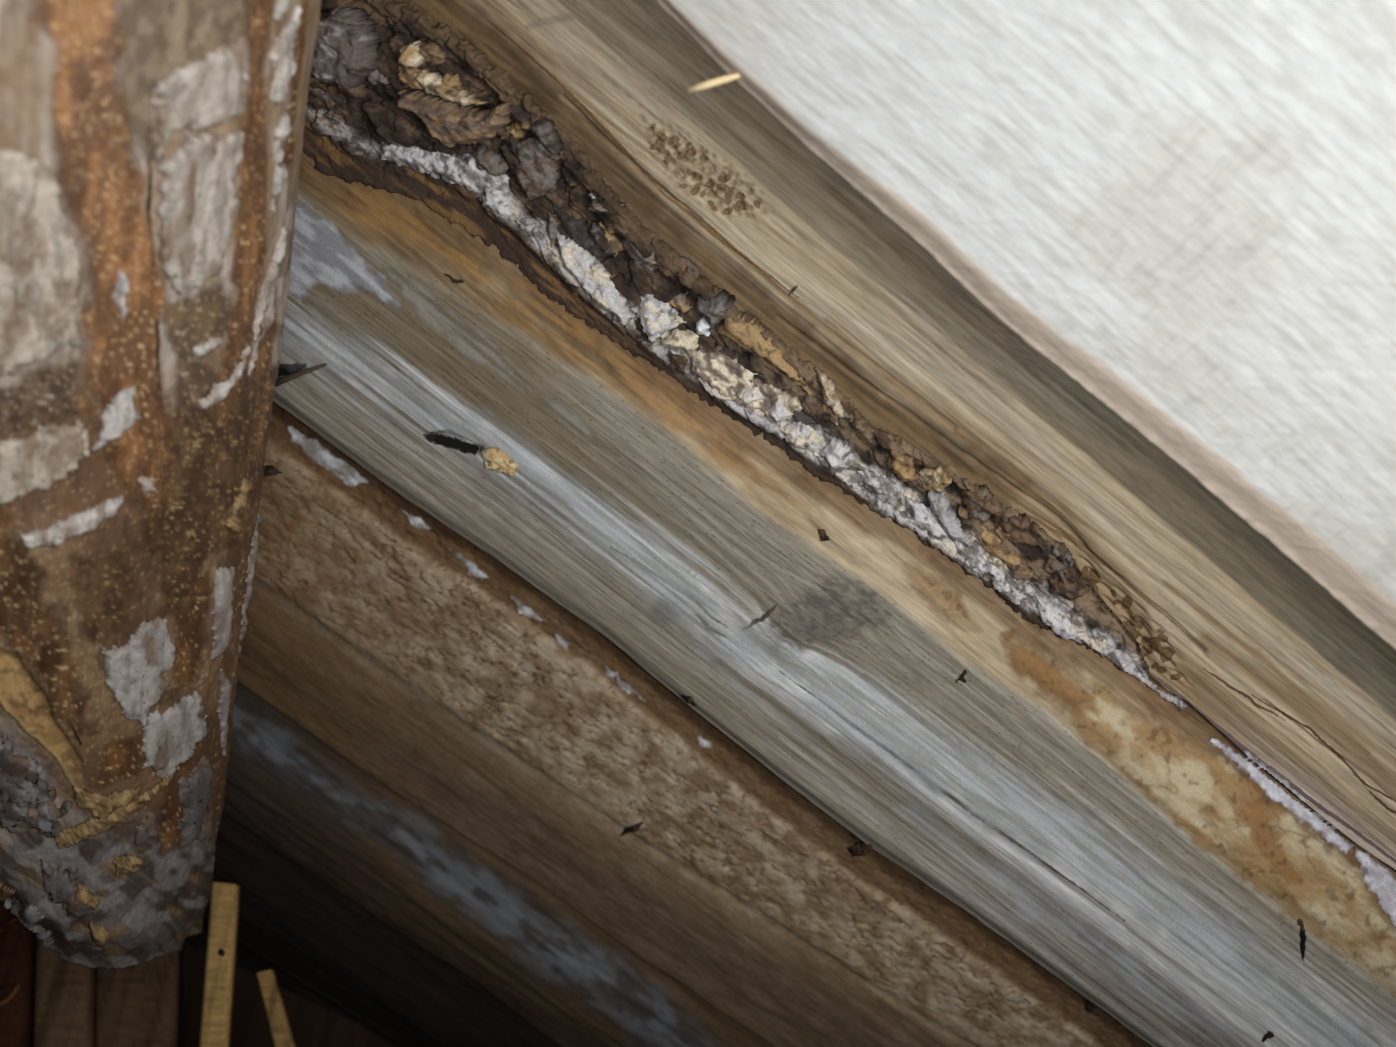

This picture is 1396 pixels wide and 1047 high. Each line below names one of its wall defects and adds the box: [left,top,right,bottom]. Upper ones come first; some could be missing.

peeling [198,0,659,409]
peeling [667,278,854,426]
damp [288,426,367,487]
damp [404,512,430,530]
damp [450,549,488,578]
damp [511,597,542,621]
damp [606,667,642,699]
peeling [888,449,1090,601]
damp [232,711,709,1047]
damp [1211,738,1396,925]